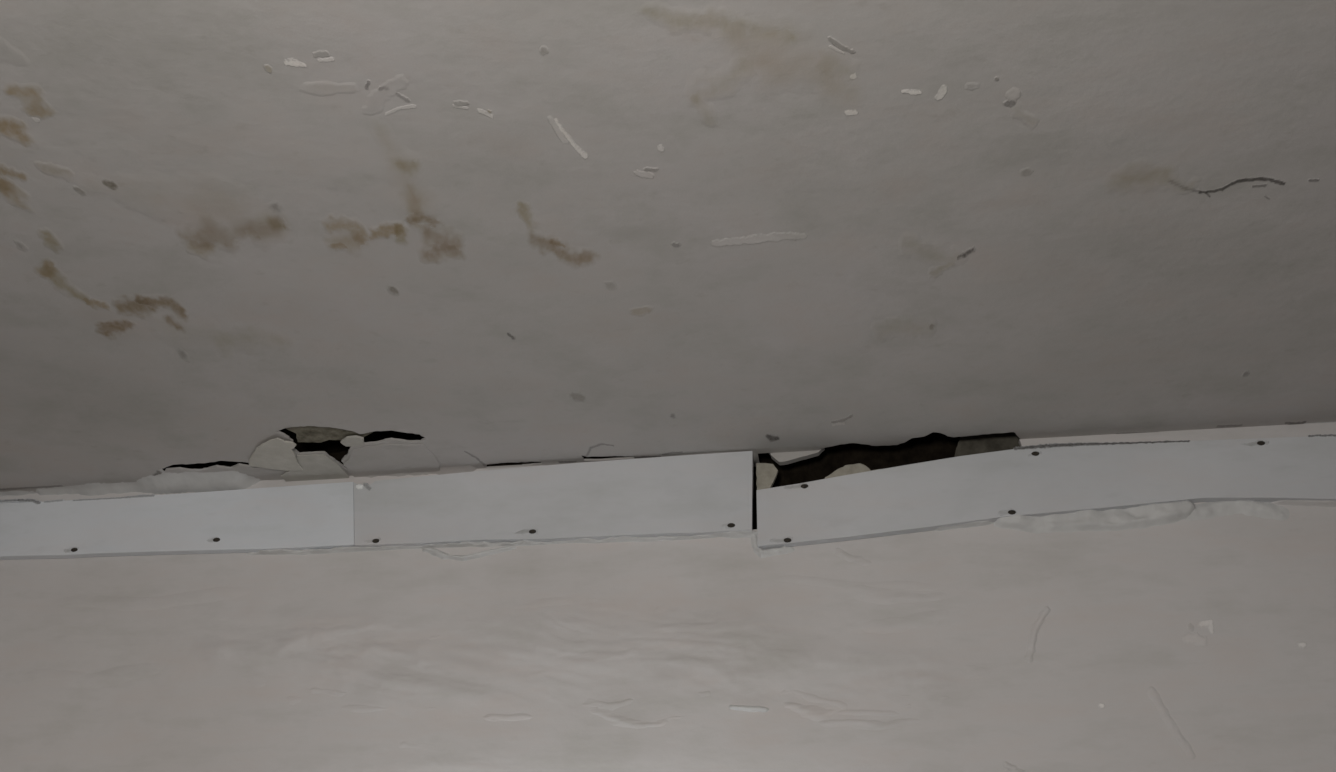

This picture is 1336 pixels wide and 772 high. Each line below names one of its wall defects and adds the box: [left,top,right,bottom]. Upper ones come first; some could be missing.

leakage [0,35,296,363]
leakage [320,115,467,266]
leakage [513,199,602,270]
crack [1193,176,1320,200]
peeling [249,426,477,491]
spalling [753,432,1020,529]